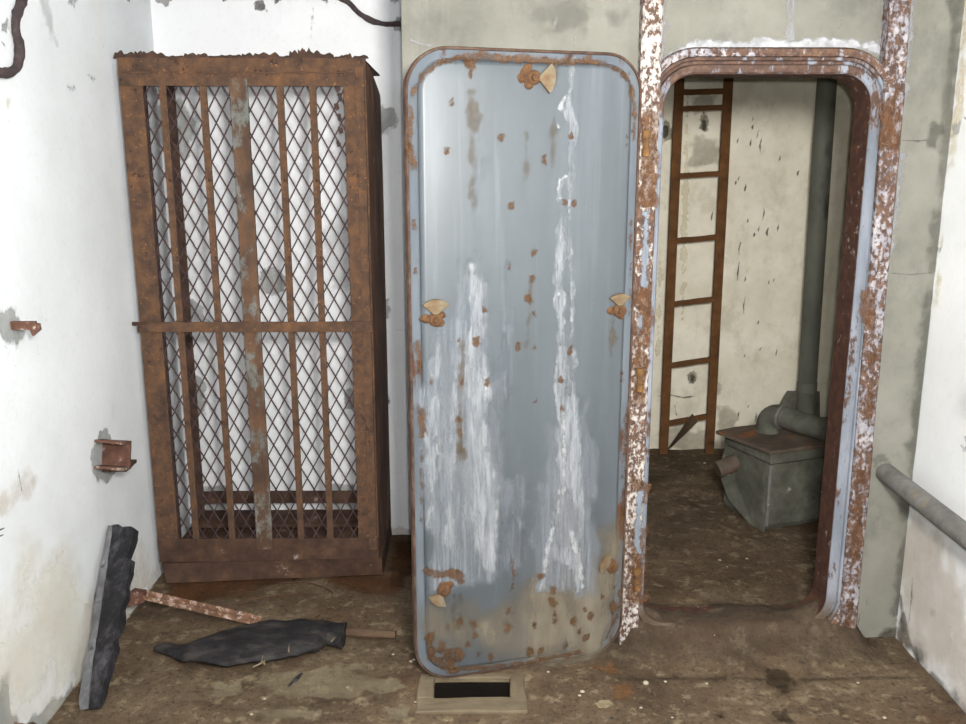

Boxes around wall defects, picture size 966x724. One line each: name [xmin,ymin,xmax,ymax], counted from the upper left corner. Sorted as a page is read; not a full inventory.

water stain [669,0,880,55]
rust [878,88,901,151]
rust [638,111,660,208]
rust [860,290,876,326]
rust [631,283,656,405]
rust [864,384,875,419]
rust [849,497,864,560]